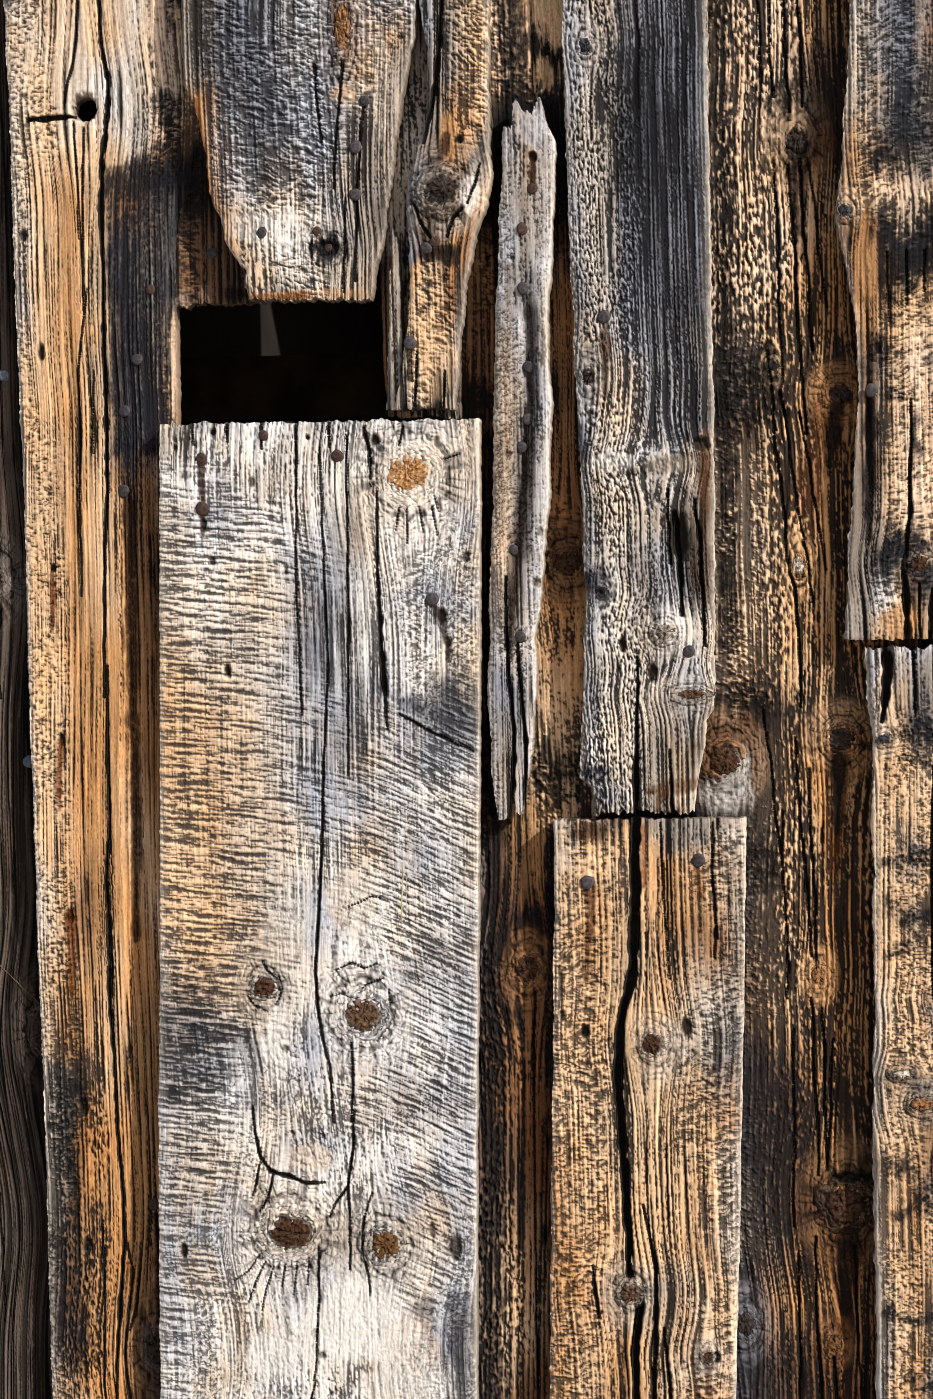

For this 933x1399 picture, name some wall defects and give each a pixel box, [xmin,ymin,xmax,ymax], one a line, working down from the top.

crack [28,0,141,1399]
crack [234,353,471,1399]
crack [505,577,528,823]
crack [531,1016,539,1387]
crack [593,657,673,1399]
crack [710,823,718,957]